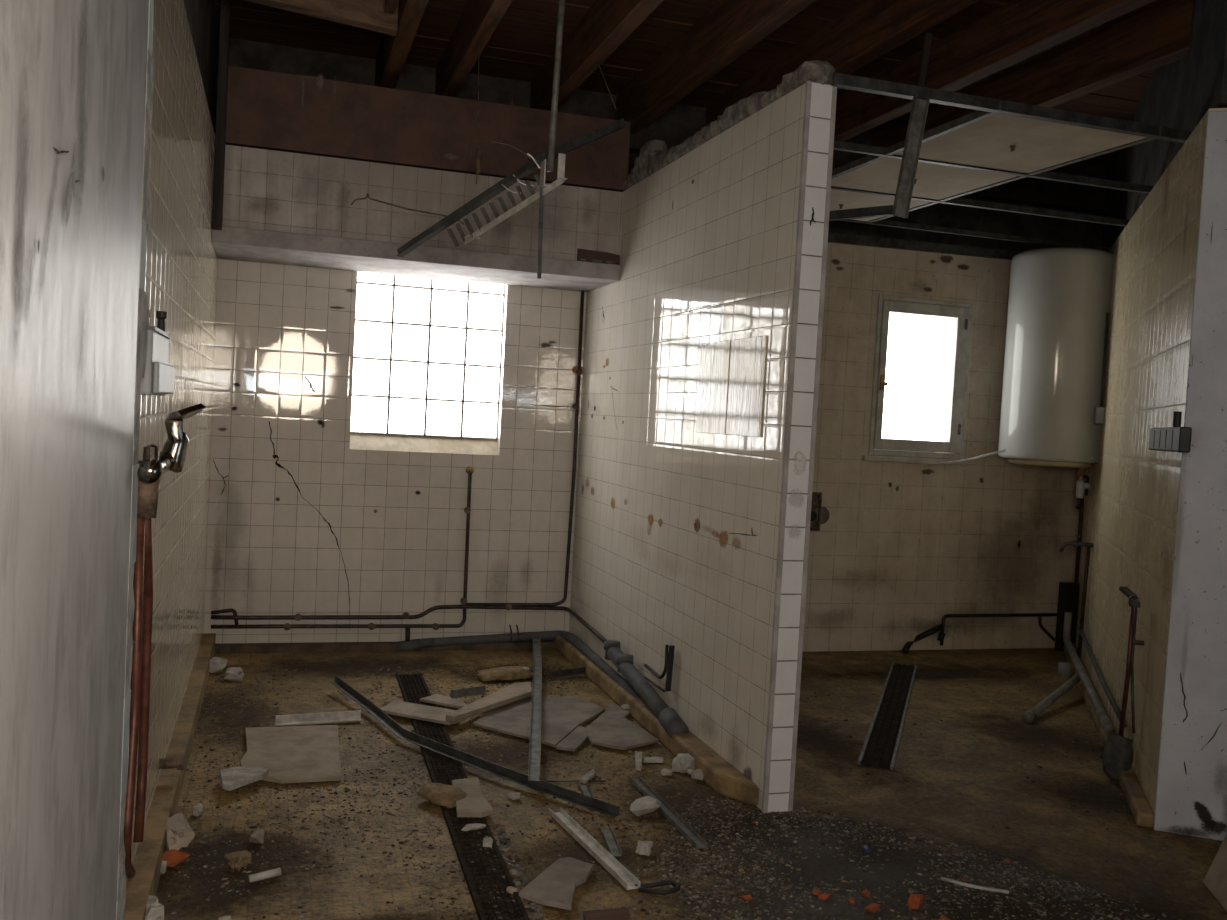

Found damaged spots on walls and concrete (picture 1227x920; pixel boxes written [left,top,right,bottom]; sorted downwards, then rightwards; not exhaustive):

spalling [623,60,835,190]
crack [269,421,350,631]
corrosion [694,518,728,546]